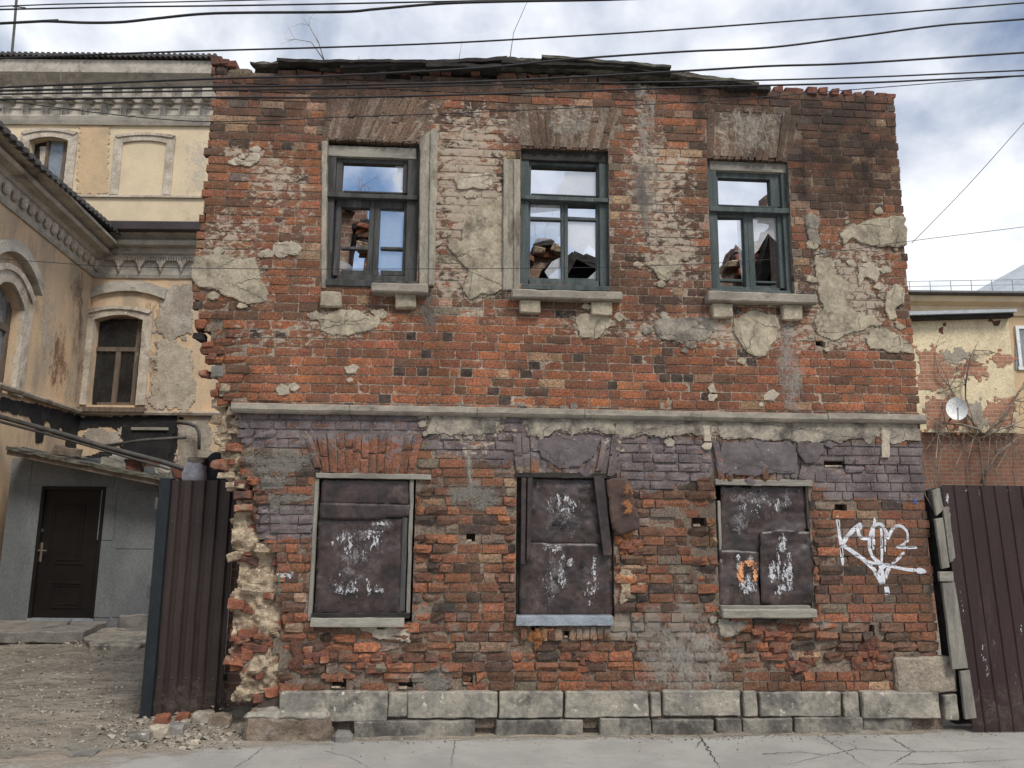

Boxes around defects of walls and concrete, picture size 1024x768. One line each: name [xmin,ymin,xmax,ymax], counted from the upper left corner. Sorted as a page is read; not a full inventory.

peeling [257,249,274,270]
peeling [872,266,892,290]
peeling [371,309,388,319]
flaking render [146,283,260,533]
flaking render [417,402,507,438]
flaking render [522,323,1018,484]
spalling [233,550,258,567]